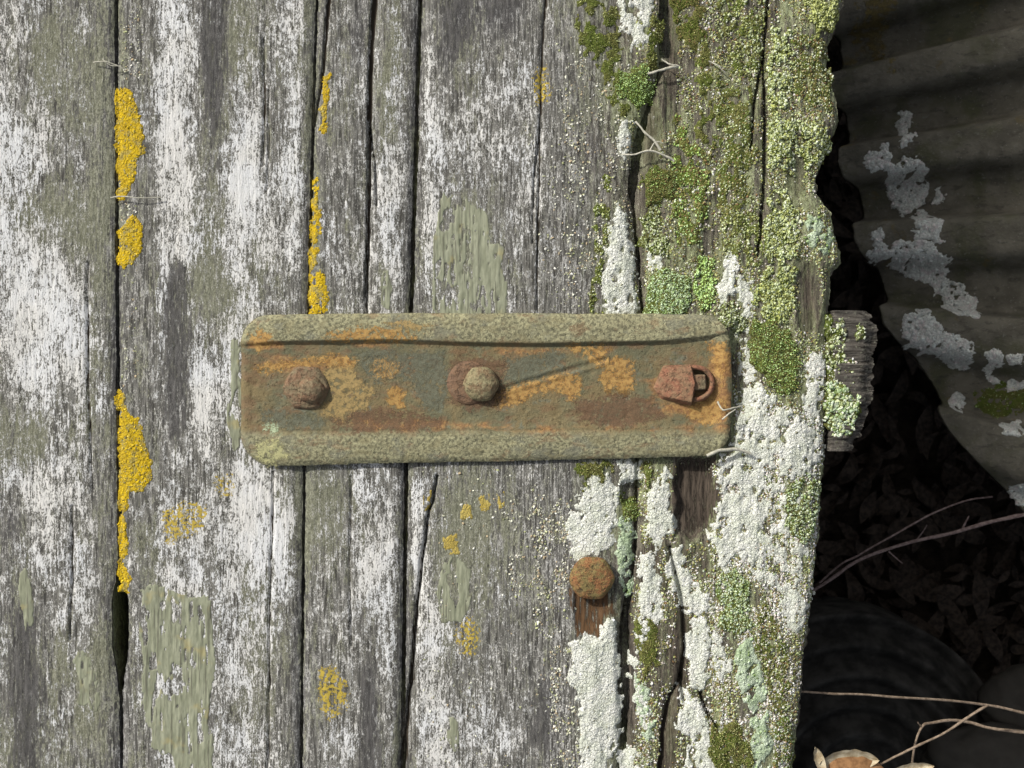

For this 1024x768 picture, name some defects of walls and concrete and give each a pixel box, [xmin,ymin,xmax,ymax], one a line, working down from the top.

peeling [432,191,509,314]
rust [246,315,442,437]
rust [448,341,667,431]
rust [683,340,731,427]
peeling [138,584,216,768]
crack [403,484,436,768]
rust [569,588,616,638]